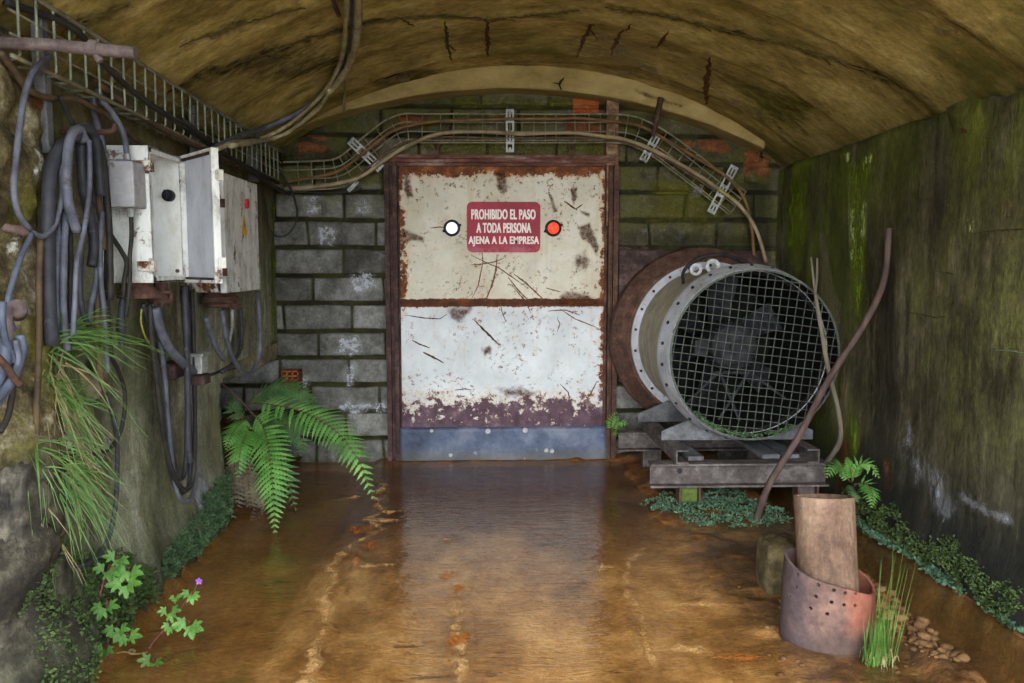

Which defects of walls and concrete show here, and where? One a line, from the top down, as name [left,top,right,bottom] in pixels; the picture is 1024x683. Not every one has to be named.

crack [167,7,902,93]
rust [497,173,506,193]
spalling [743,150,770,177]
rust [571,187,598,267]
water stain [850,204,867,260]
rust [560,293,598,306]